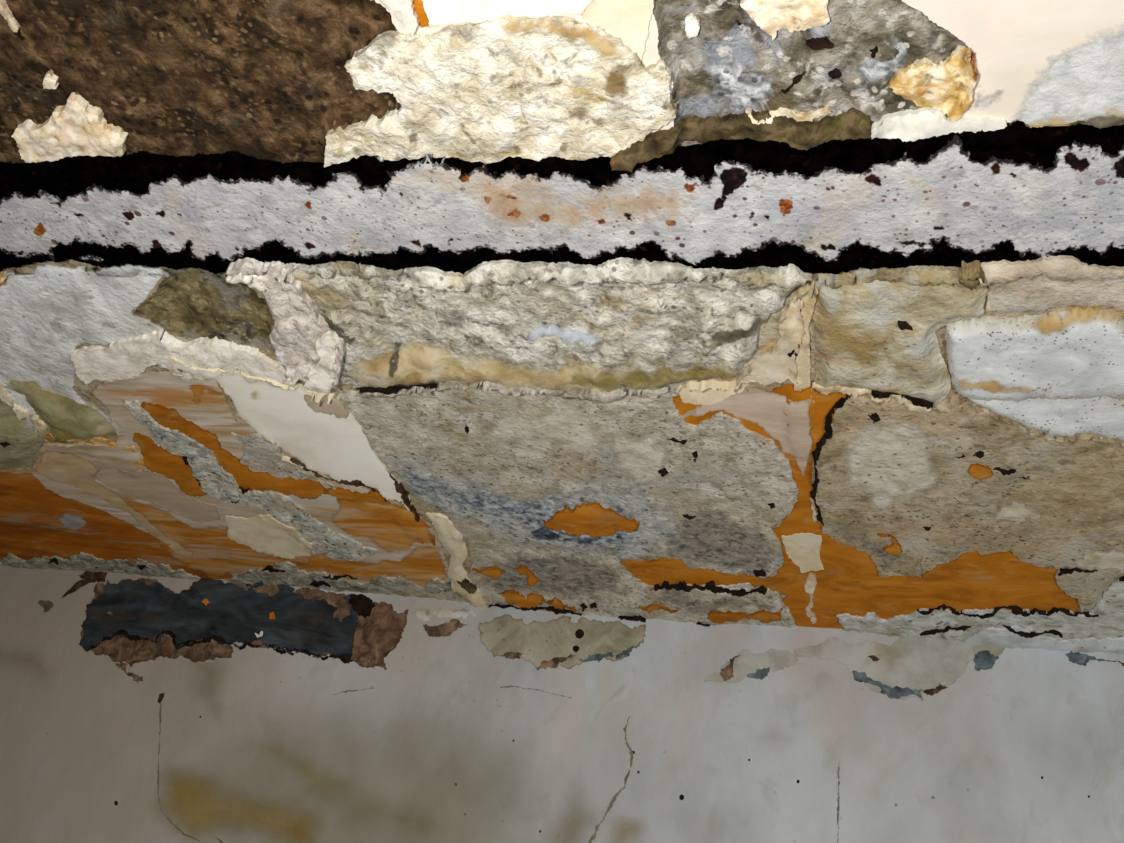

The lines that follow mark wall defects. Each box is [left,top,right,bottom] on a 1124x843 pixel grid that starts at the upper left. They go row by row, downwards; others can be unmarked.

spalling [0,0,1007,174]
spalling [0,254,1124,700]
crack [116,662,223,843]
crack [588,716,634,843]